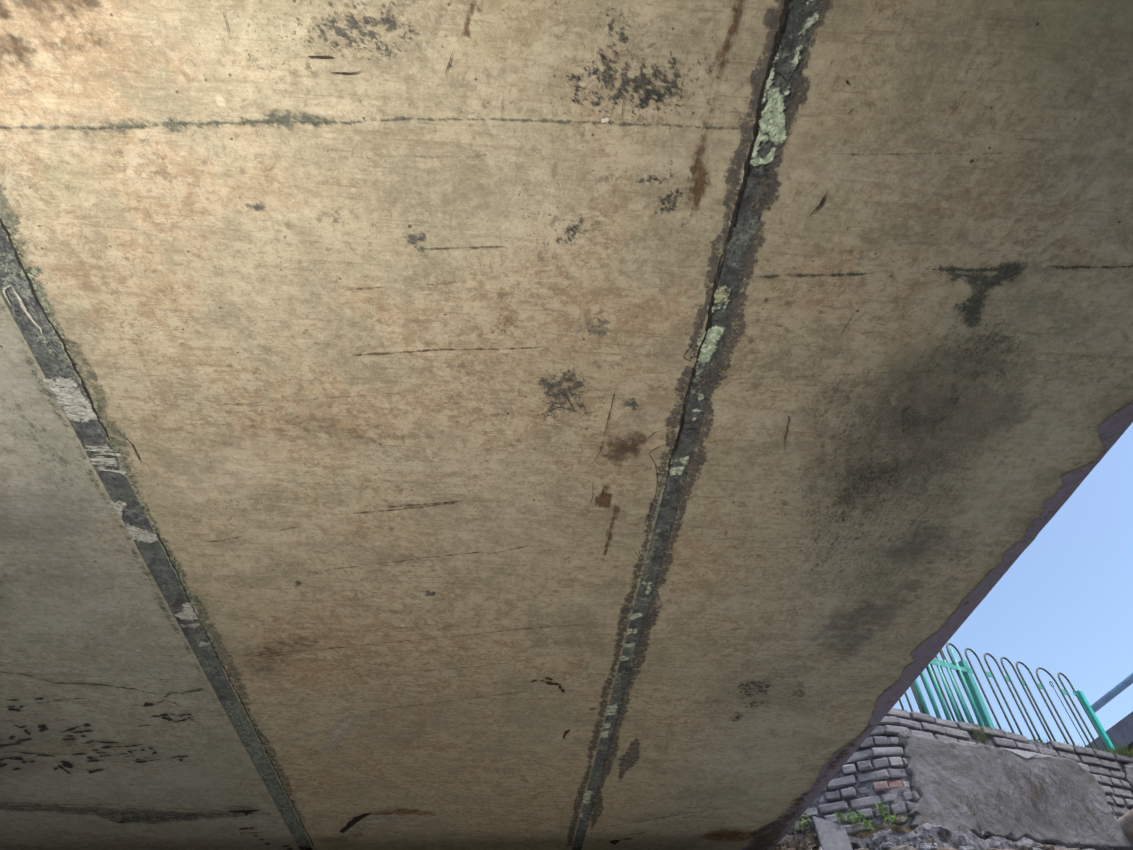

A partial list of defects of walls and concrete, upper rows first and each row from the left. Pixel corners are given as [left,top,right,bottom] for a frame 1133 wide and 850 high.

water stain [0,35,31,61]
water stain [0,0,47,18]
rust [716,0,742,73]
rust [690,125,710,207]
water stain [525,367,590,421]
water stain [554,0,832,847]
water stain [0,185,316,850]
rust [595,486,619,555]
water stain [742,402,1133,850]
peeling [0,723,188,774]
peeling [140,702,194,727]